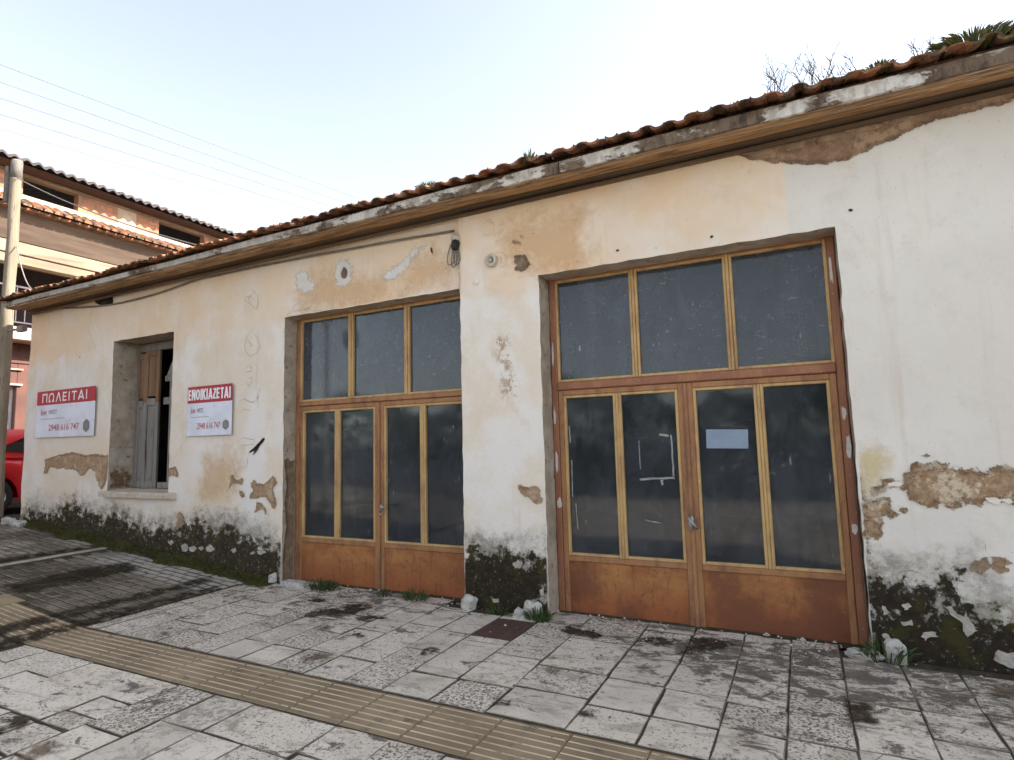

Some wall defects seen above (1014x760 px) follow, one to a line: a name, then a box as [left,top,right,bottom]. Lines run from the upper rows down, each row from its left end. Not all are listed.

spalling [512,235,531,272]
spalling [43,452,108,489]
water stain [20,494,281,583]
spalling [229,458,294,581]
water stain [464,534,549,614]
spalling [518,484,543,504]
spalling [846,436,1014,635]
water stain [866,548,1014,676]